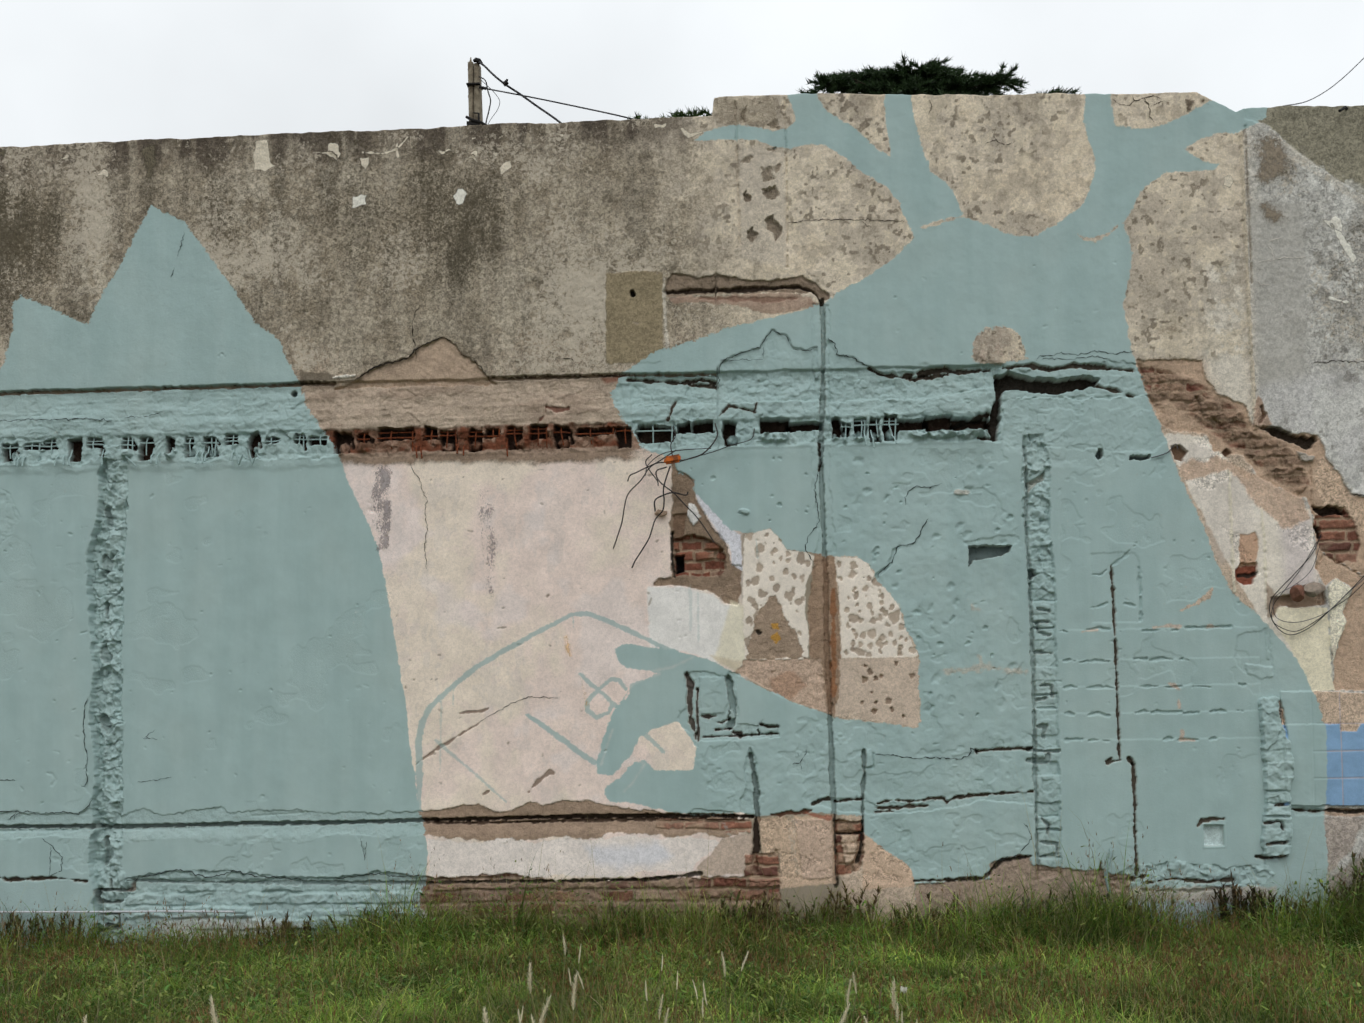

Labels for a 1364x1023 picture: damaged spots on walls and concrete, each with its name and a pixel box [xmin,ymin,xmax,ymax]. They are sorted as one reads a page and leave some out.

crack [355,306,486,380]
crack [718,330,867,384]
crack [1037,350,1135,360]
spalling [0,330,1364,930]
crack [126,869,299,882]
crack [337,842,419,879]
flaking render [123,870,781,947]